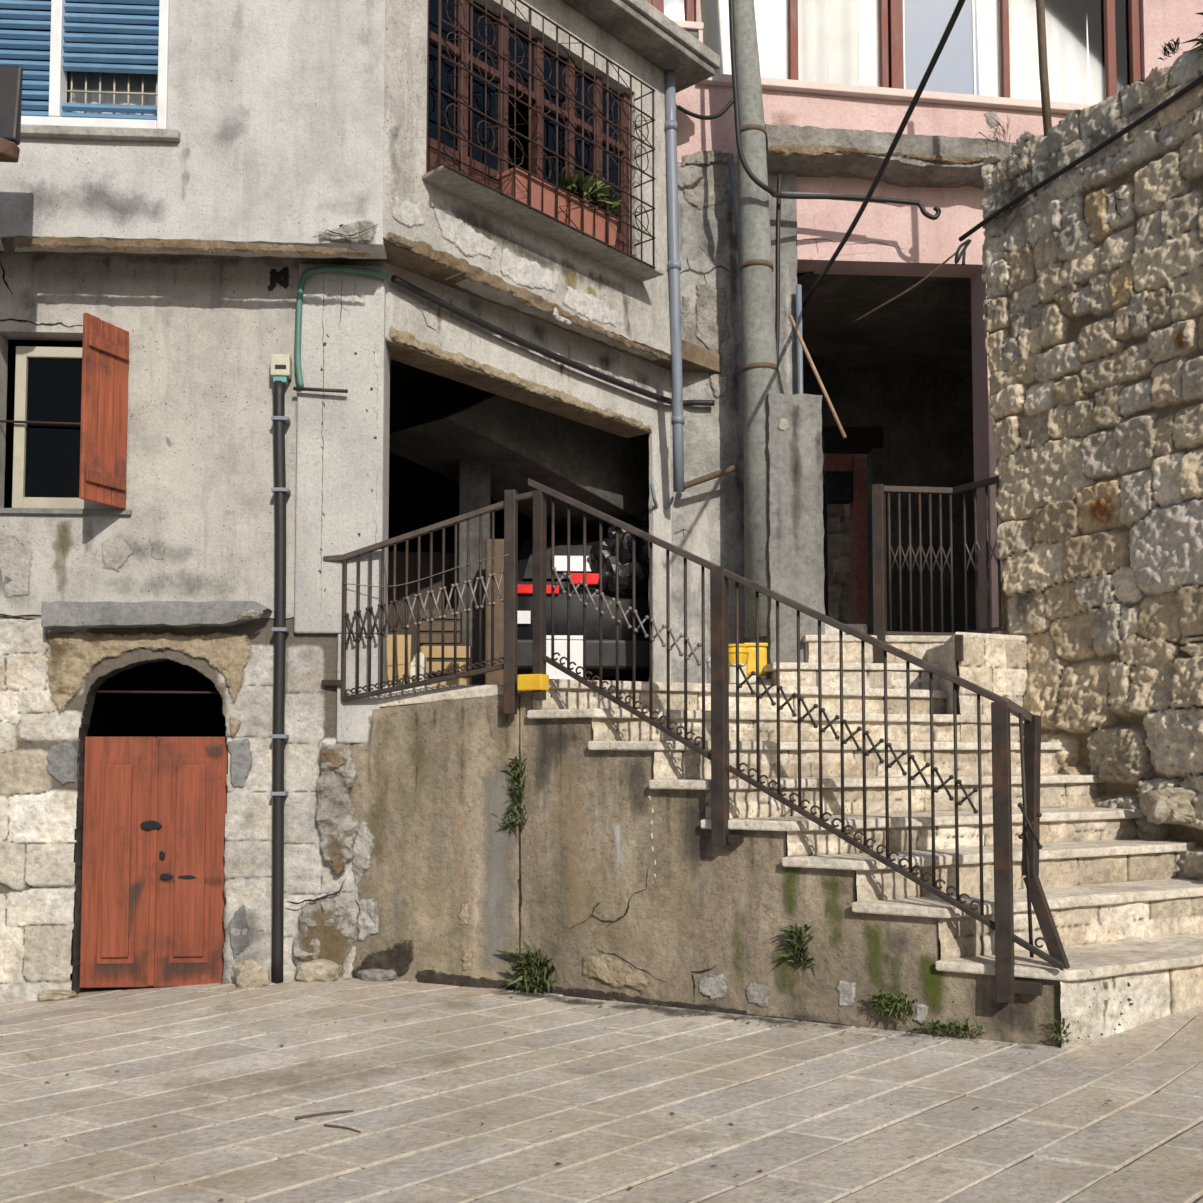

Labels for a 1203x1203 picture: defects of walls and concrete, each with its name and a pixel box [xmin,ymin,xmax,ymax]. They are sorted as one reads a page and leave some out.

crack [0,261,83,327]
peeling [1,194,668,360]
crack [680,258,731,284]
crack [311,224,378,599]
damp [57,524,69,564]
spalling [47,608,263,713]
crack [516,745,524,943]
spalling [293,743,858,1028]
crack [570,866,718,997]